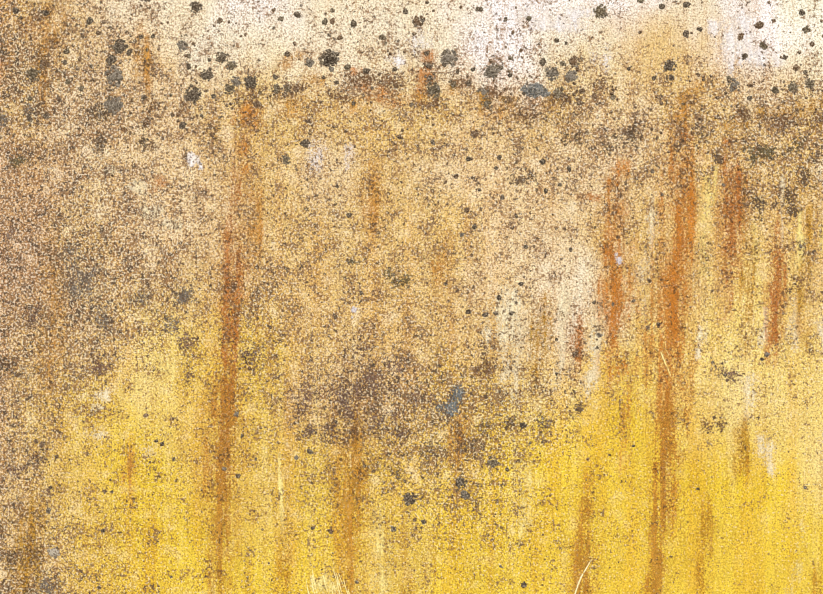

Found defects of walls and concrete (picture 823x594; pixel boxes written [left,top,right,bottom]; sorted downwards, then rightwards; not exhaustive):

mould [91,133,107,158]
mould [120,96,163,153]
mould [224,79,310,110]
leakage [325,69,406,105]
mould [450,71,514,102]
mould [509,89,582,128]
corrosion [587,160,637,379]
corrosion [623,78,706,594]
corrosion [723,162,755,296]
corrosion [765,251,786,364]
corrosion [203,216,244,594]
mould [278,337,465,459]